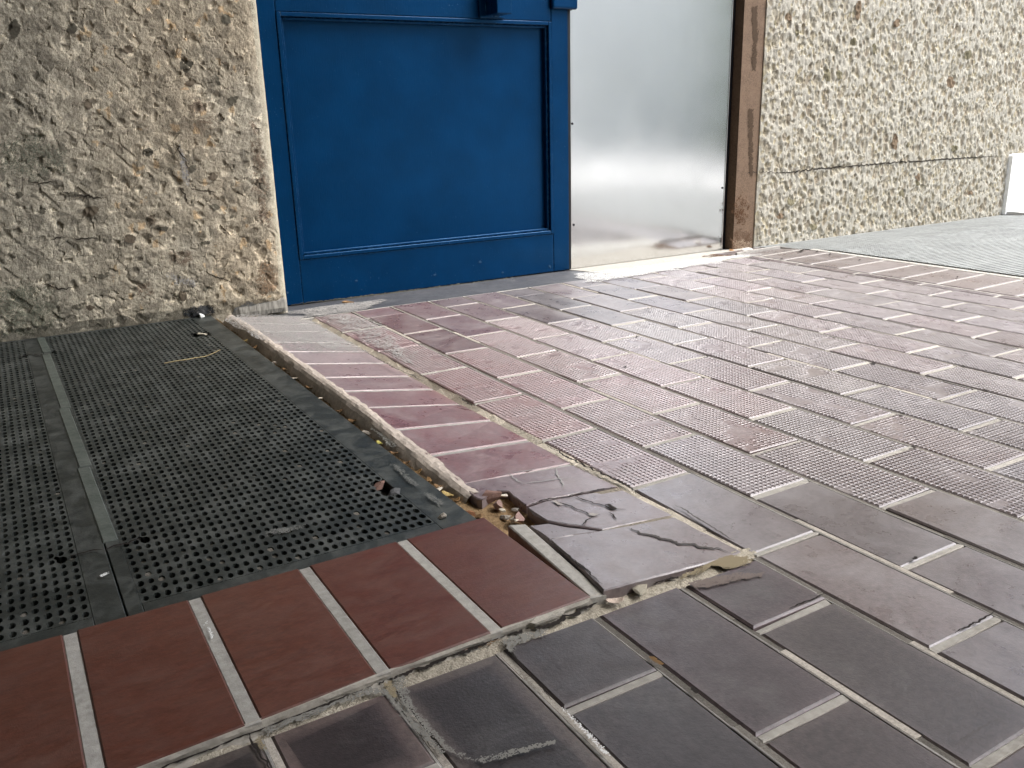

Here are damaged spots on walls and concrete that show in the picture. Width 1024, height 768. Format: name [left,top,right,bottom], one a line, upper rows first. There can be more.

crack [748,155,993,174]
crack [161,445,733,768]